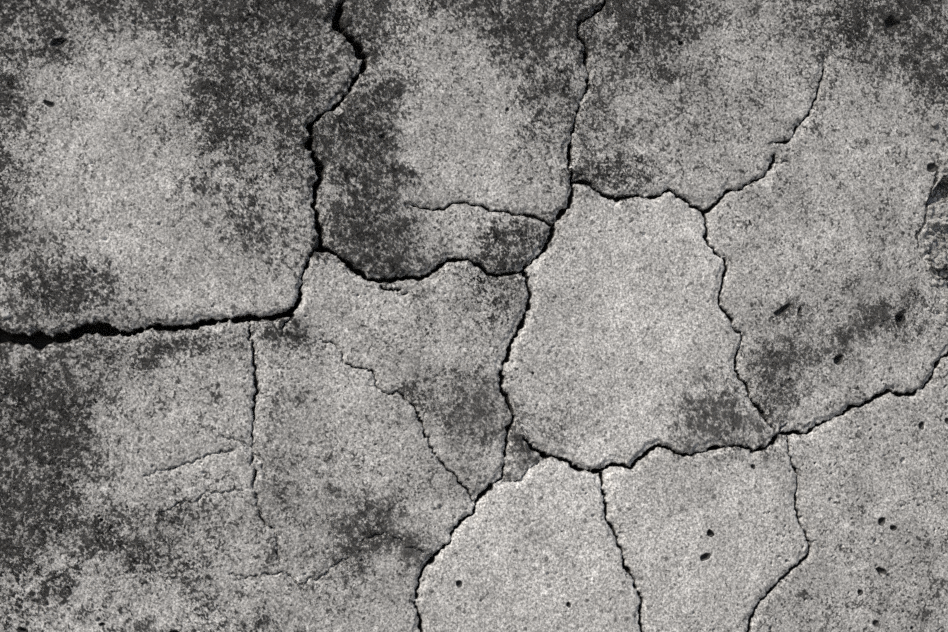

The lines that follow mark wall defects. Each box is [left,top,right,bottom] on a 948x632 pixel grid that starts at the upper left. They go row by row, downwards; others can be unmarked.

crack [0,0,777,457]
crack [775,69,824,144]
crack [342,355,505,632]
crack [523,352,948,632]